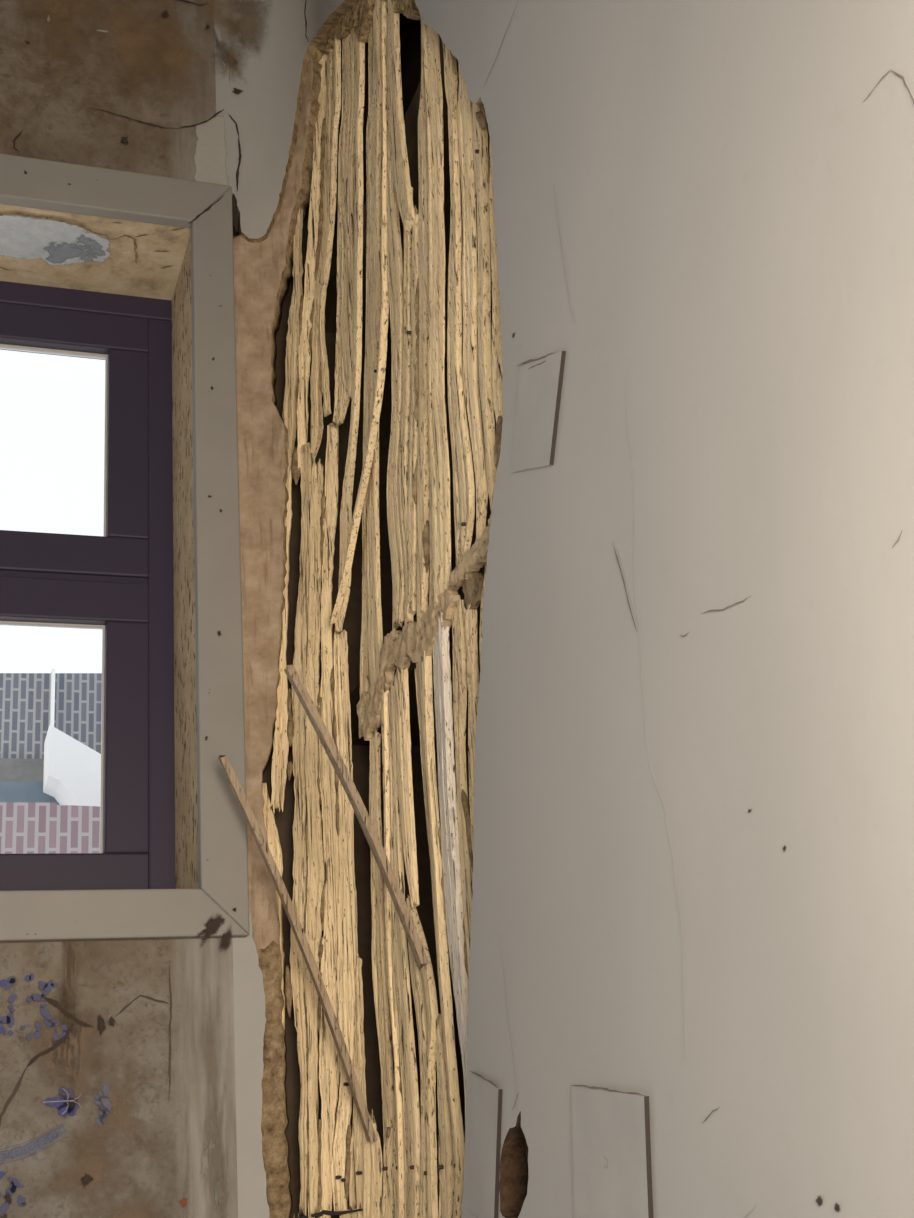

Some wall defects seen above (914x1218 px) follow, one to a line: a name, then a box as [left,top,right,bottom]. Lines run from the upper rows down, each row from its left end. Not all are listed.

crack [863,70,914,103]
crack [89,107,242,224]
peeling [0,212,138,271]
flaking render [233,0,503,1218]
spalling [198,916,231,949]
crack [0,968,172,1126]